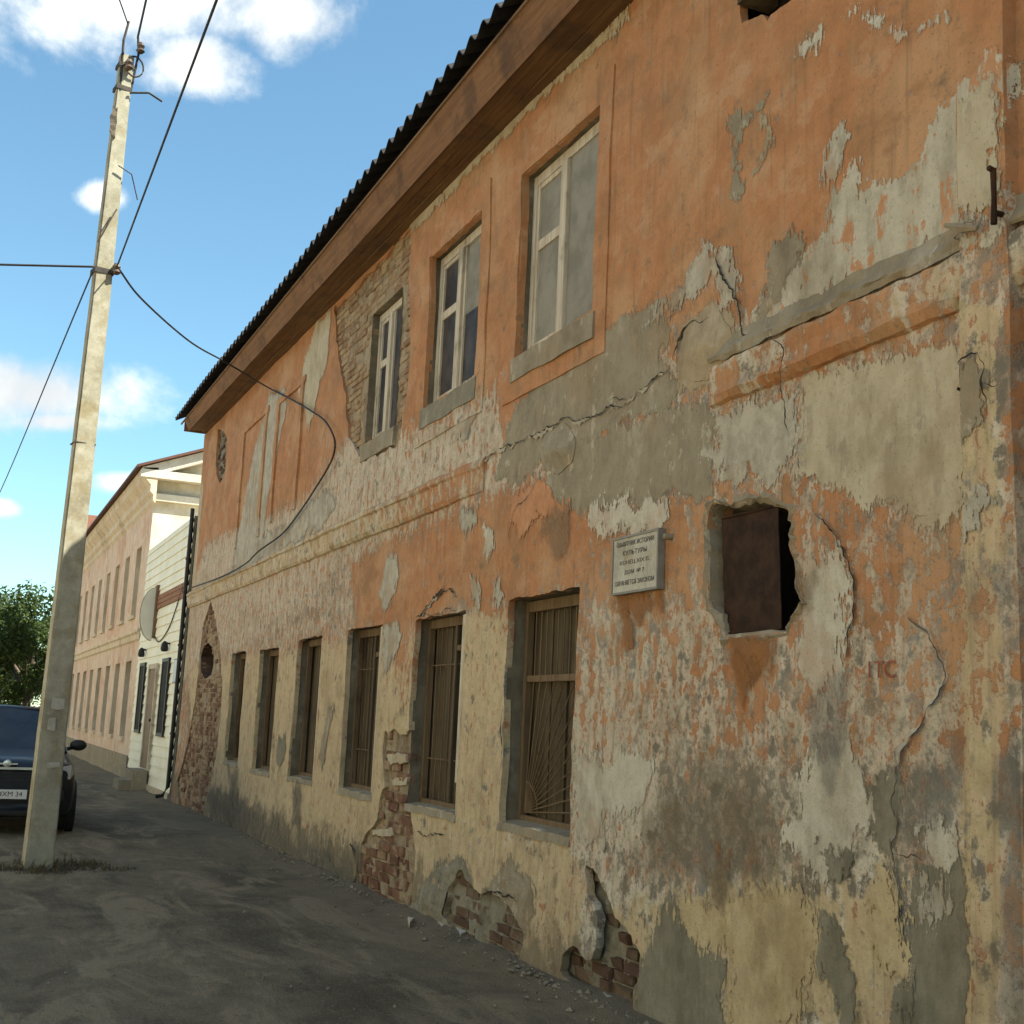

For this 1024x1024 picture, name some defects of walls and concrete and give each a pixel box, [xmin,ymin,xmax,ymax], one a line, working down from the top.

flaking render [229,4,630,572]
crack [484,317,708,462]
peeling [641,237,743,330]
peeling [725,90,776,204]
crack [714,254,789,433]
peeling [751,44,1024,322]
crack [812,513,855,658]
peeling [697,341,997,708]
flaking render [179,603,222,814]
flaking render [358,730,524,957]
peeling [568,719,971,1024]
crack [890,616,951,940]